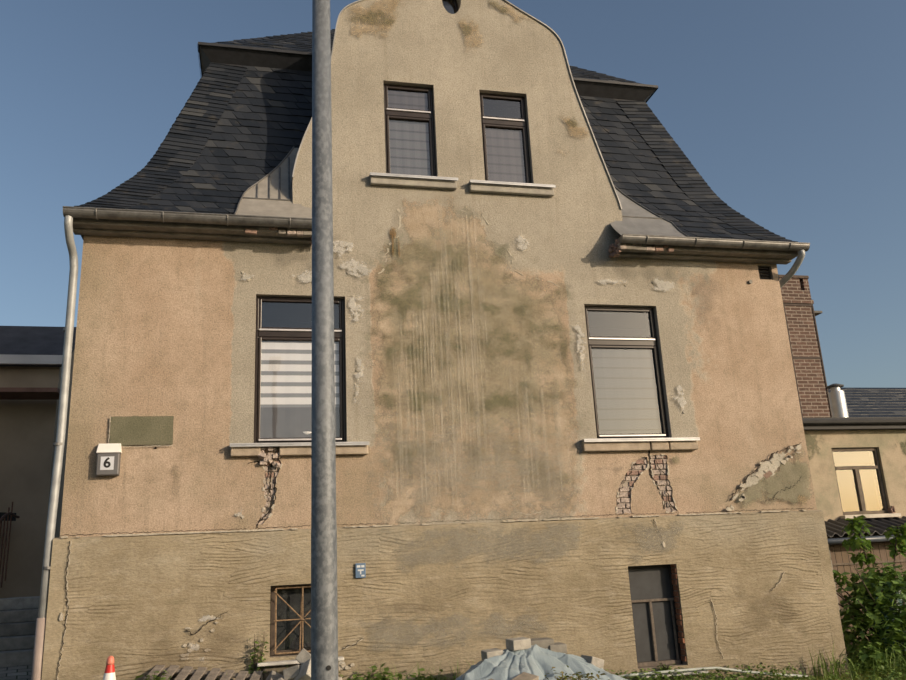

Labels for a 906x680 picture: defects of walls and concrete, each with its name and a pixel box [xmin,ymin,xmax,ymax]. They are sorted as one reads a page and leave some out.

spalling [245,226,312,245]
peeling [293,270,312,283]
peeling [333,199,586,526]
flaking render [616,450,677,514]
peeling [725,442,812,511]
crack [339,508,811,542]
crack [56,446,306,680]
flaking render [180,611,228,660]